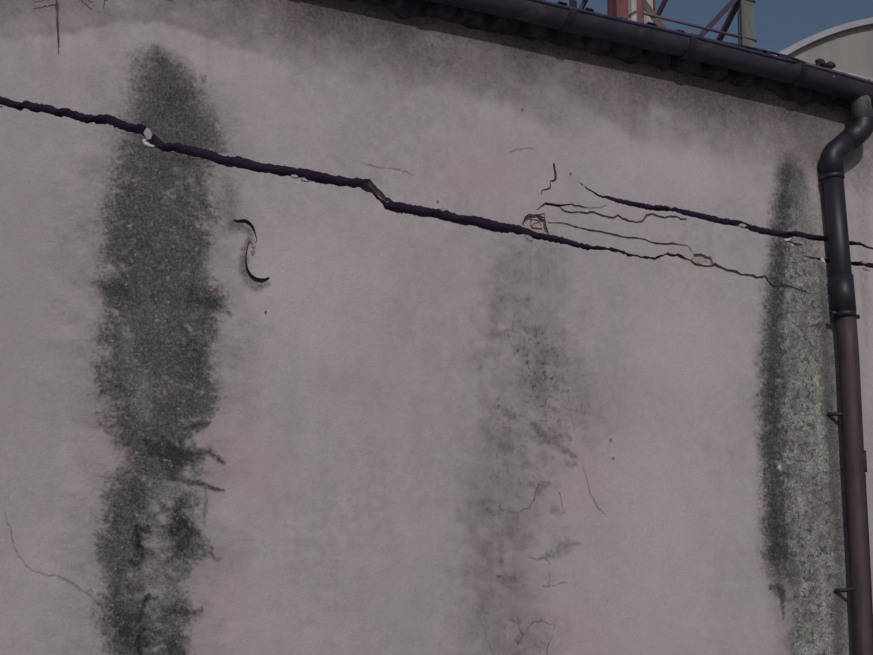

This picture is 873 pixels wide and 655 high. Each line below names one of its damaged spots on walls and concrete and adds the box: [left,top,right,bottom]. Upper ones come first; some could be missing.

leakage [230,0,851,153]
crack [0,96,830,264]
crack [233,219,269,283]
spalling [521,213,549,234]
spalling [690,253,714,267]
crack [714,263,810,294]
crack [849,241,873,270]
leakage [95,53,226,655]
leakage [756,163,848,655]